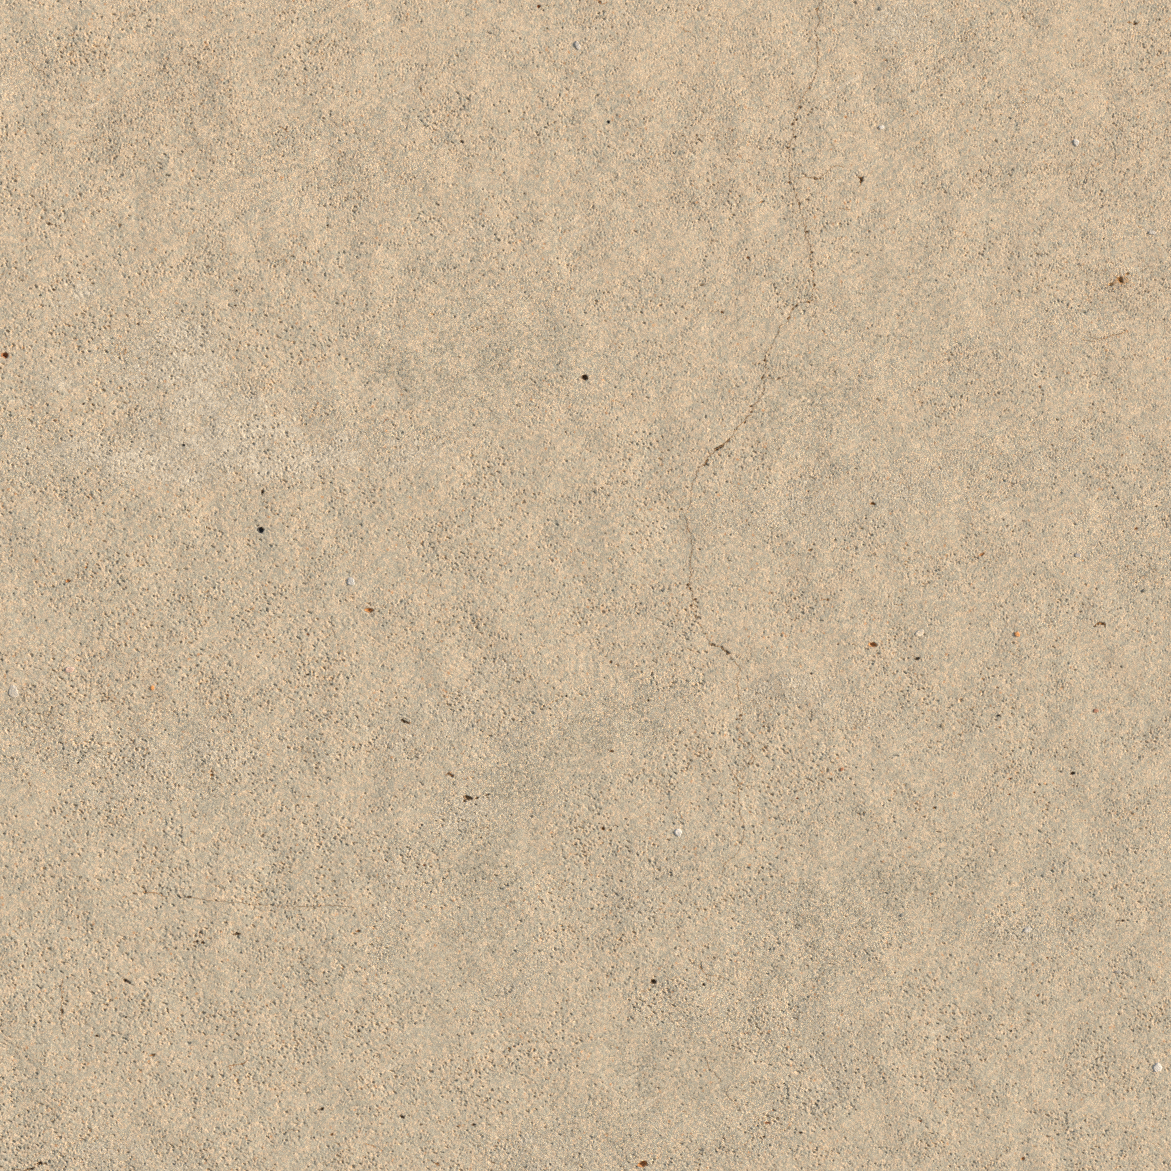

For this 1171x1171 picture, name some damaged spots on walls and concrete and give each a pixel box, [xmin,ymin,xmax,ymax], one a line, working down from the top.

crack [685,0,843,866]